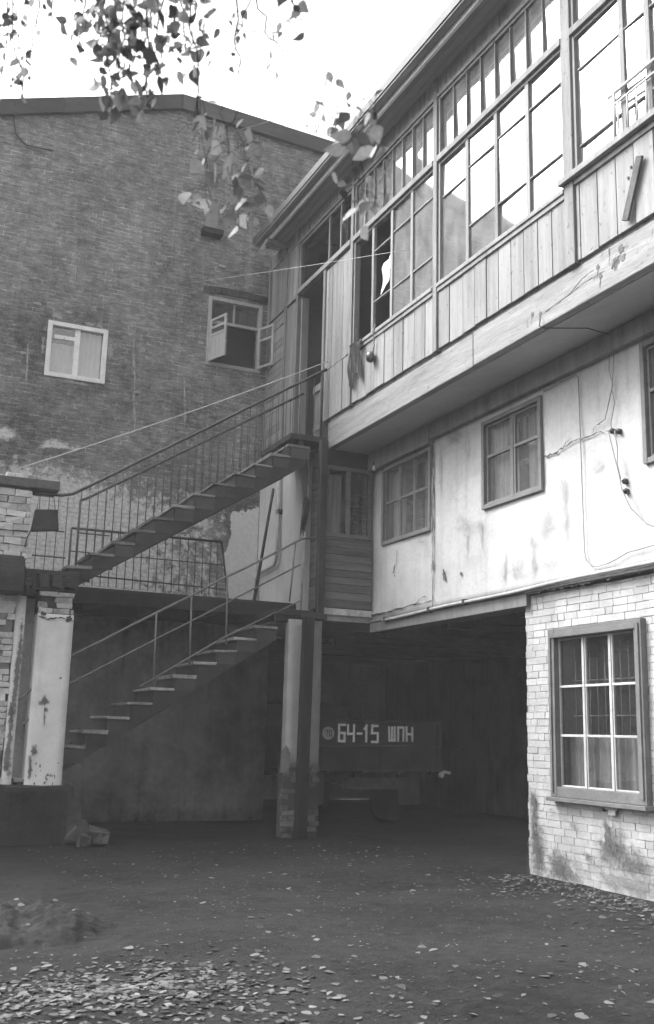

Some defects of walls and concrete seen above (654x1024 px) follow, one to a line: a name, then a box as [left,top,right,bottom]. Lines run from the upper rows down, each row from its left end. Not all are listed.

peeling [0,427,16,441]
peeling [0,438,194,571]
peeling [79,506,259,600]
water stain [528,793,573,881]
water stain [586,821,654,898]